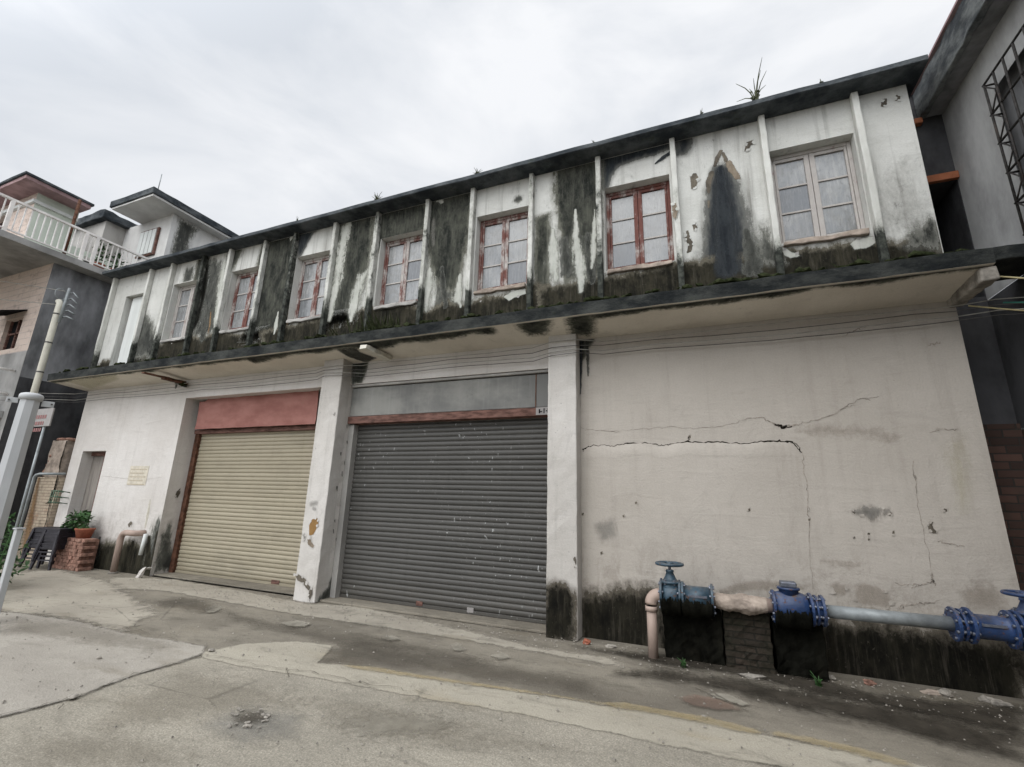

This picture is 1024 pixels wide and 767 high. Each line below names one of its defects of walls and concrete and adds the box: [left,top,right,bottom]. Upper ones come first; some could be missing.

water stain [242,231,317,341]
water stain [327,192,471,328]
water stain [534,138,693,293]
spalling [683,222,698,253]
water stain [701,164,789,279]
crack [580,396,879,585]
crack [896,461,963,609]
water stain [591,648,1024,759]